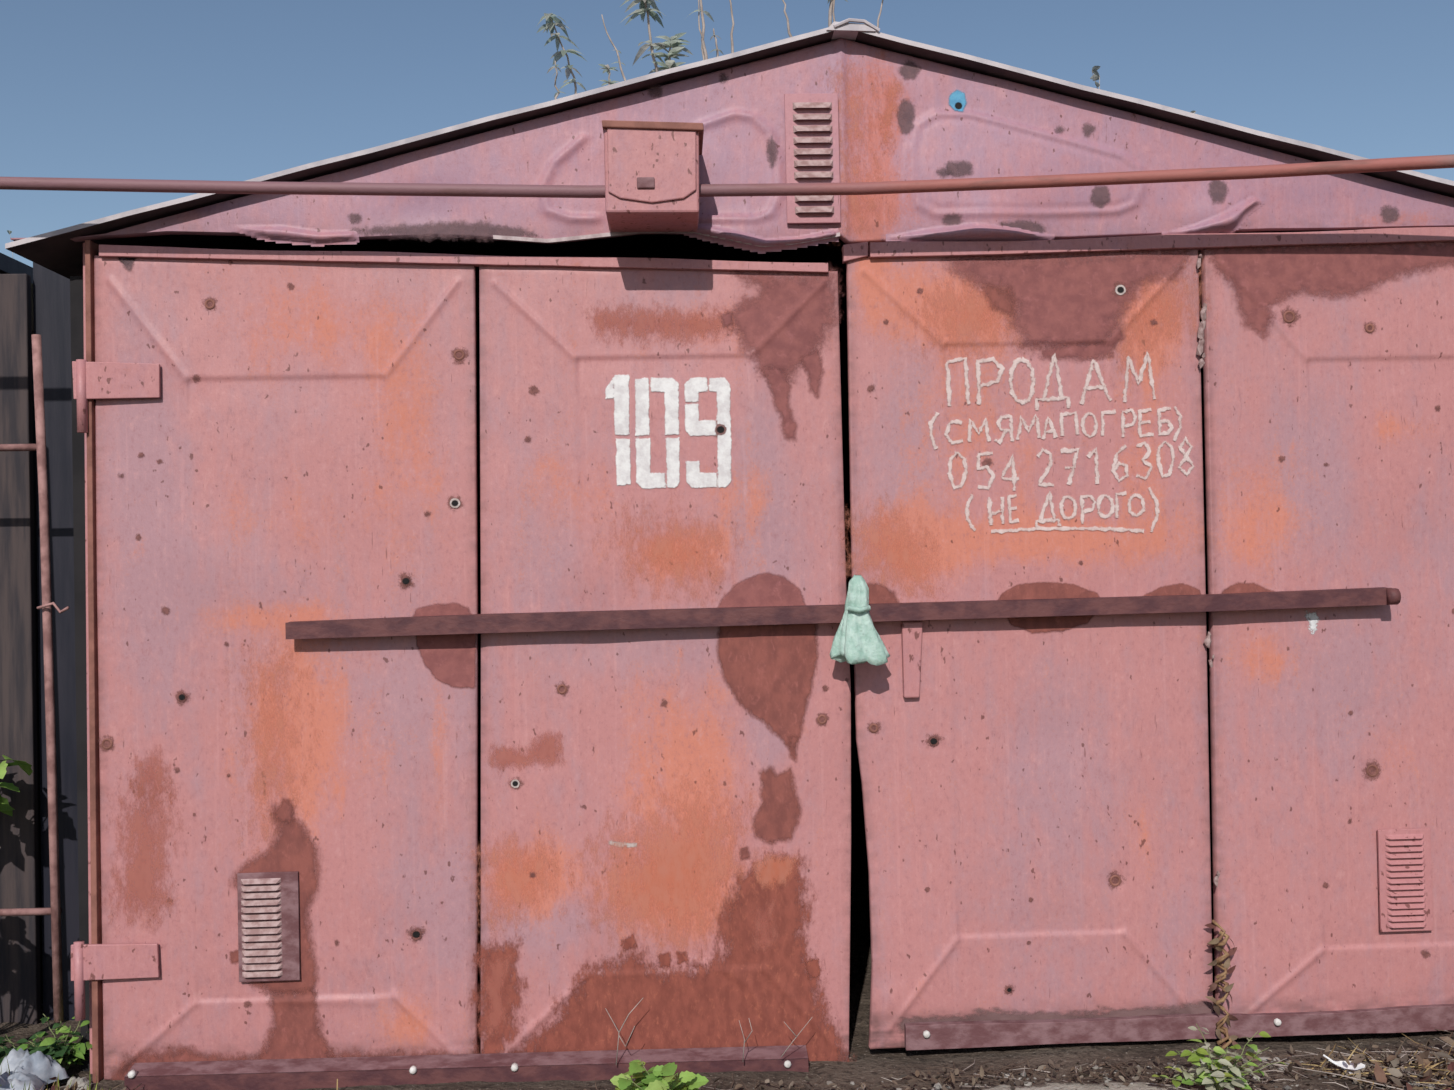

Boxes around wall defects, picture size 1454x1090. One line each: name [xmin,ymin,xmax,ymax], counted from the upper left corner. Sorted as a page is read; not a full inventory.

rust [953,249,1189,361]
rust [1208,241,1454,338]
rust [722,271,835,439]
rust [413,603,471,617]
rust [718,573,805,608]
rust [999,582,1099,633]
rust [416,634,476,688]
rust [471,623,849,1062]
rust [234,799,331,1060]